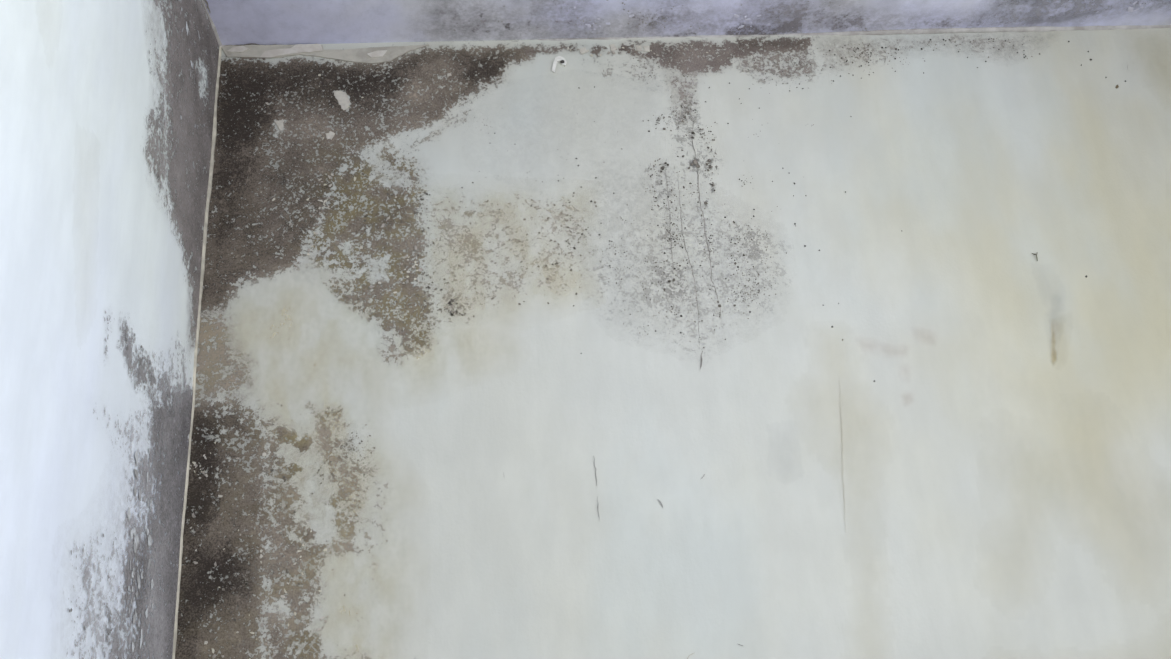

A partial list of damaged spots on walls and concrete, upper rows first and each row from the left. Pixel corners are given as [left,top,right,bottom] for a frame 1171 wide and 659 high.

leakage [68,0,910,659]
leakage [996,0,1170,25]